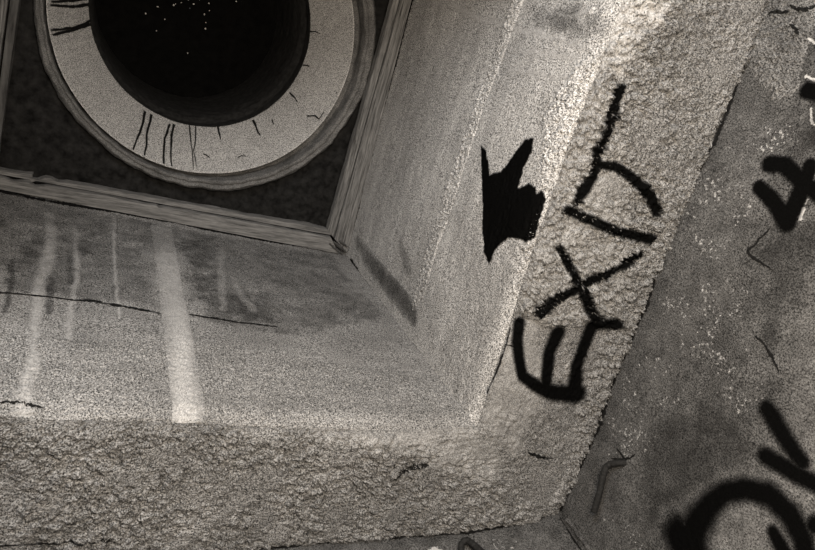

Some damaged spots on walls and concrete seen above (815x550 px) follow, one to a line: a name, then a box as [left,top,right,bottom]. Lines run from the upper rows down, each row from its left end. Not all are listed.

crack [769,5,815,35]
crack [385,0,413,104]
crack [0,189,322,251]
crack [746,228,773,270]
leakage [15,228,55,417]
crack [0,292,161,314]
leakage [161,252,199,423]
crack [189,314,278,327]
crack [0,400,43,408]